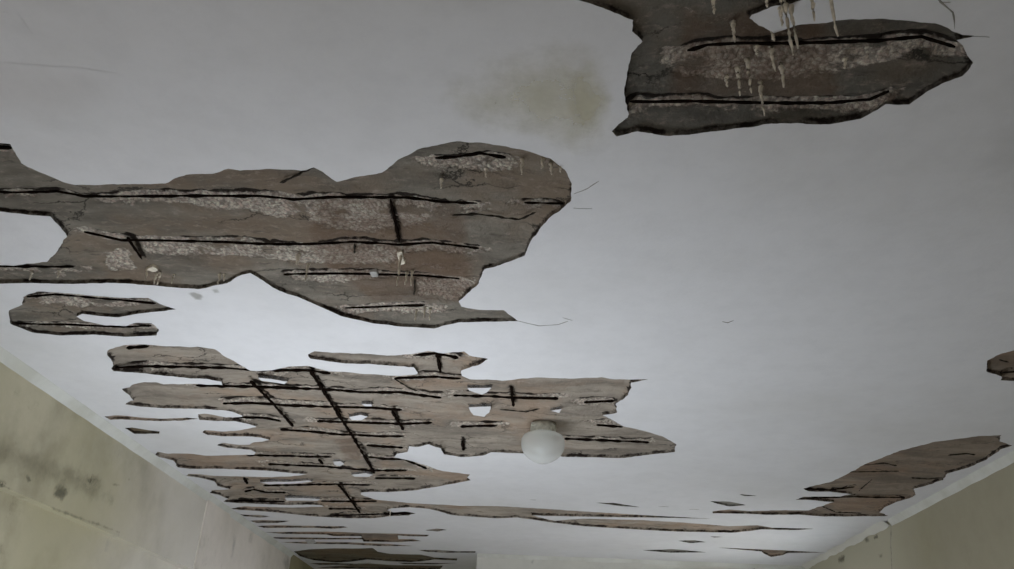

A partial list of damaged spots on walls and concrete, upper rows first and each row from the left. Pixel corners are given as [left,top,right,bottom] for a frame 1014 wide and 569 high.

spalling [580,0,973,136]
spalling [0,141,1014,569]